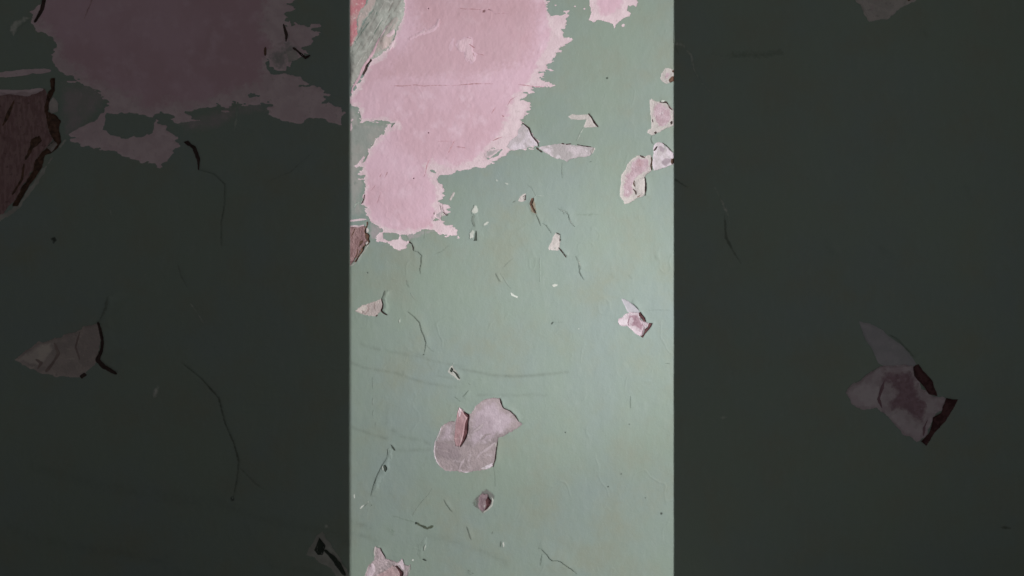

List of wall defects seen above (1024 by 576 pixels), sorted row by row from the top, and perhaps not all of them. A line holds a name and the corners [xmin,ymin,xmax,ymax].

peeling [0,0,638,267]
peeling [620,99,674,204]
peeling [15,292,132,379]
peeling [355,290,392,317]
peeling [618,299,653,338]
peeling [846,322,958,445]
peeling [434,398,523,514]
flaking render [306,523,349,576]
flaking render [365,545,414,576]